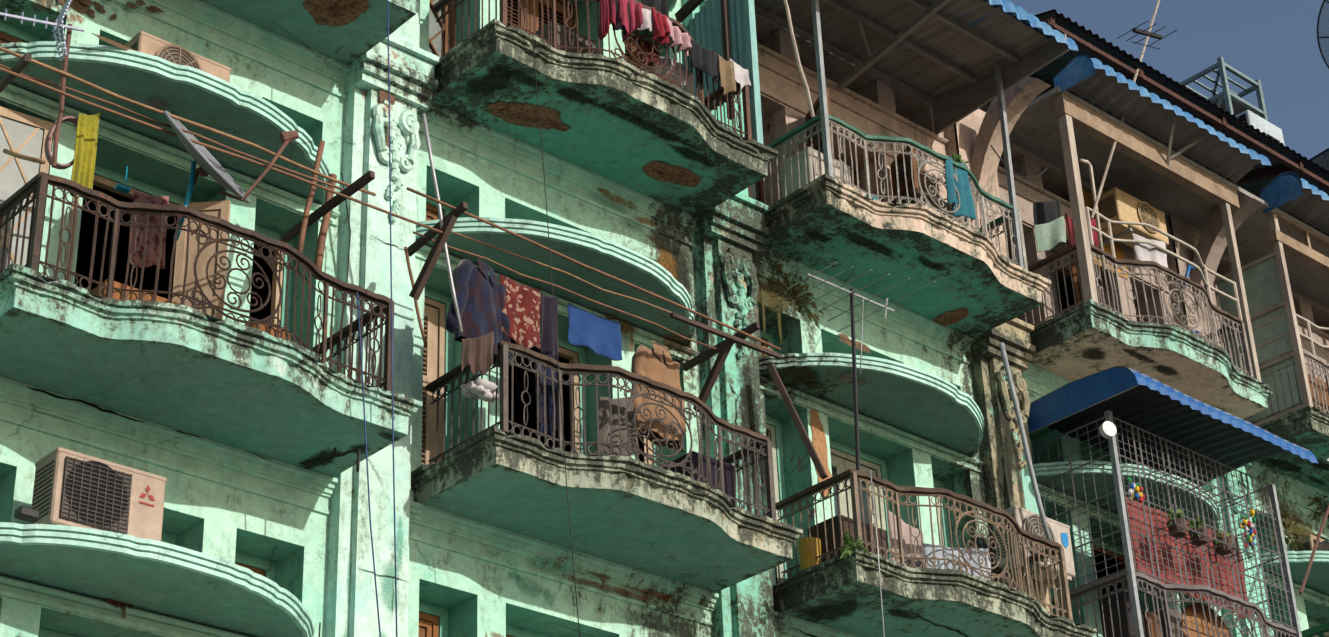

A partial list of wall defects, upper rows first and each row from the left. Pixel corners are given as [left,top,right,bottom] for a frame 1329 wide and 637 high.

peeling [57,0,164,52]
spalling [302,0,369,27]
spalling [487,102,571,132]
spalling [642,161,701,187]
water stain [673,242,692,295]
water stain [757,278,787,342]
crack [25,386,202,439]
crack [249,447,350,464]
water stain [736,363,768,511]
crack [909,610,968,637]